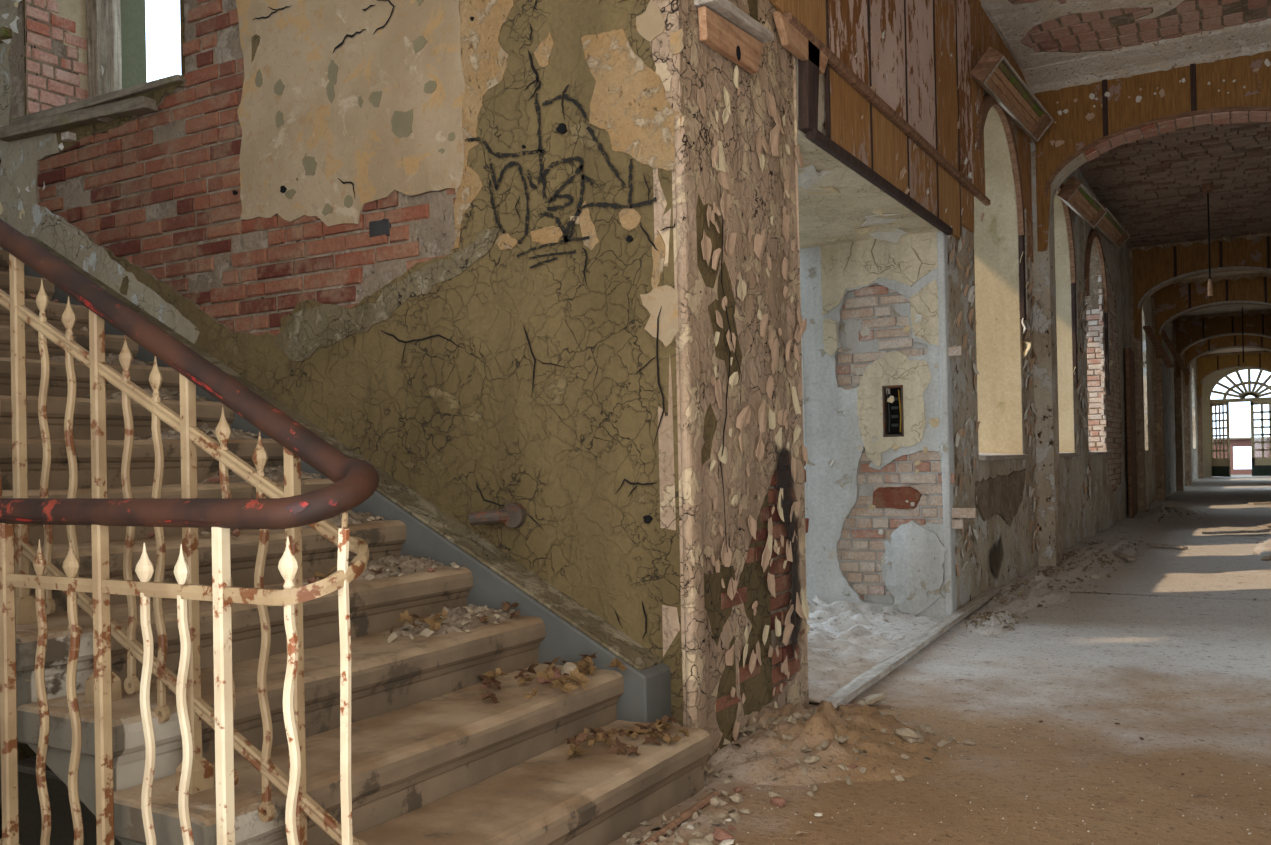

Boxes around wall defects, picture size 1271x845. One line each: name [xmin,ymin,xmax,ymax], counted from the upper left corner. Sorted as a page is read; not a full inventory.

crack [333,0,395,52]
flaking render [1021,0,1271,53]
peeling [581,0,684,171]
peeling [0,0,600,361]
crack [581,248,589,286]
peeling [619,207,641,242]
peeling [640,230,679,347]
crack [523,325,566,396]
crack [635,306,665,444]
peeling [697,65,840,742]
peeling [820,208,1040,605]
crack [615,478,658,497]